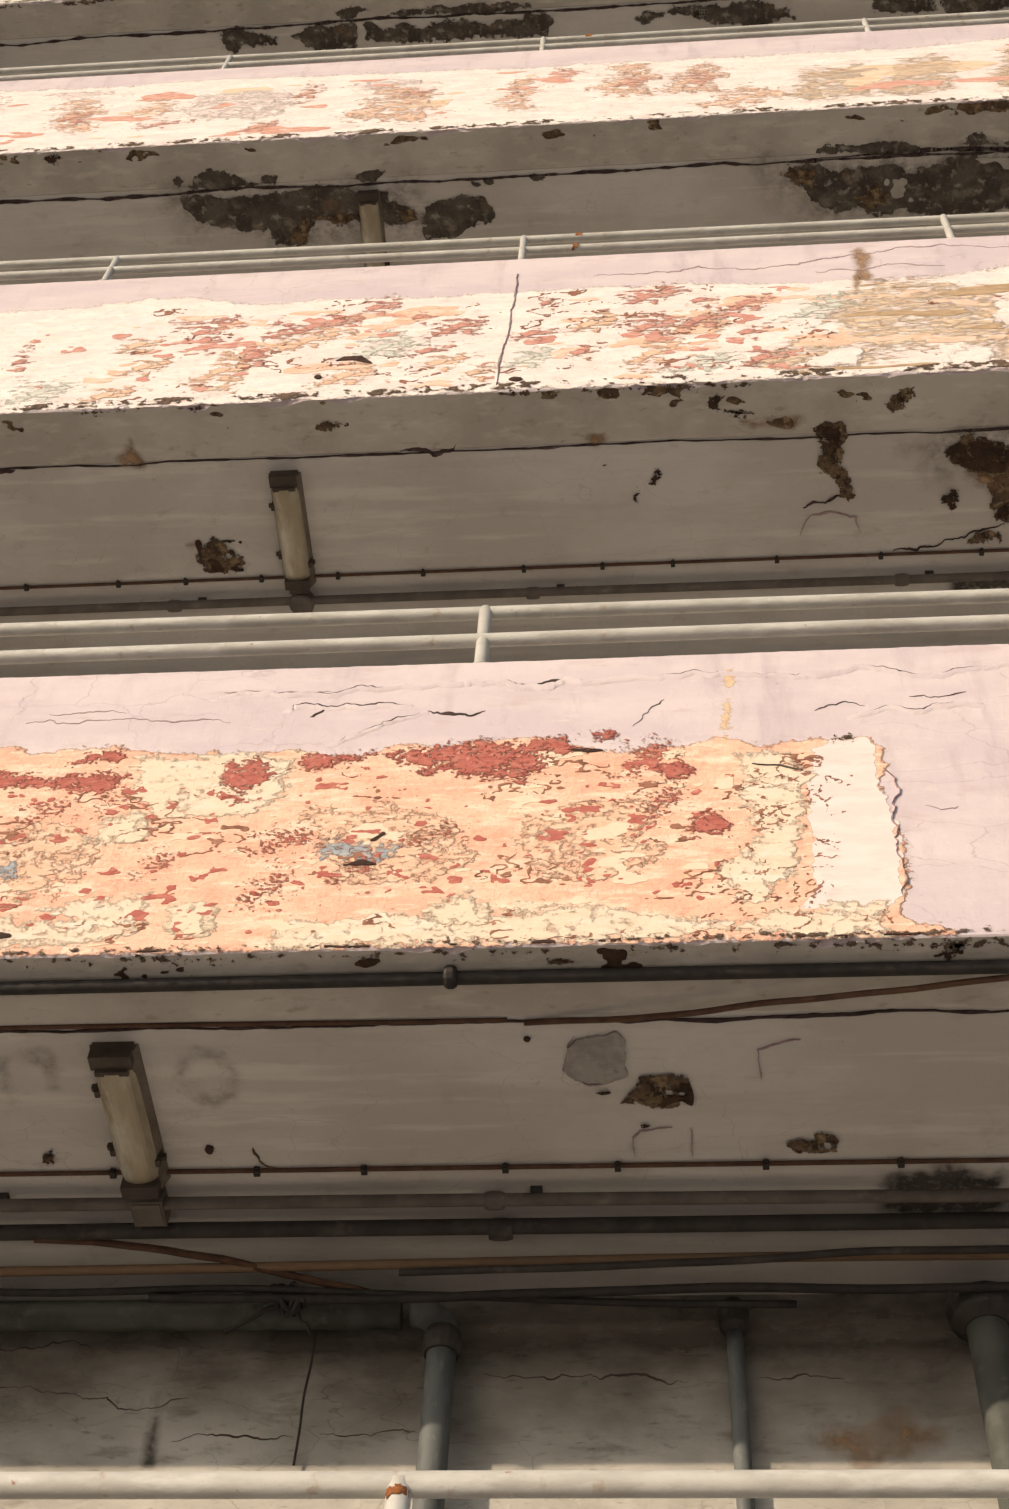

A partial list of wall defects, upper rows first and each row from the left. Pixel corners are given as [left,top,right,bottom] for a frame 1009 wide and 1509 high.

peeling [219,1,554,54]
peeling [634,0,796,26]
peeling [872,0,1009,16]
peeling [0,38,1009,217]
peeling [173,168,495,247]
peeling [0,265,1009,432]
crack [26,662,1009,748]
peeling [0,699,1009,979]
crack [549,1373,614,1381]
crack [650,1376,688,1385]
crack [759,1373,846,1381]
crack [82,1397,417,1442]